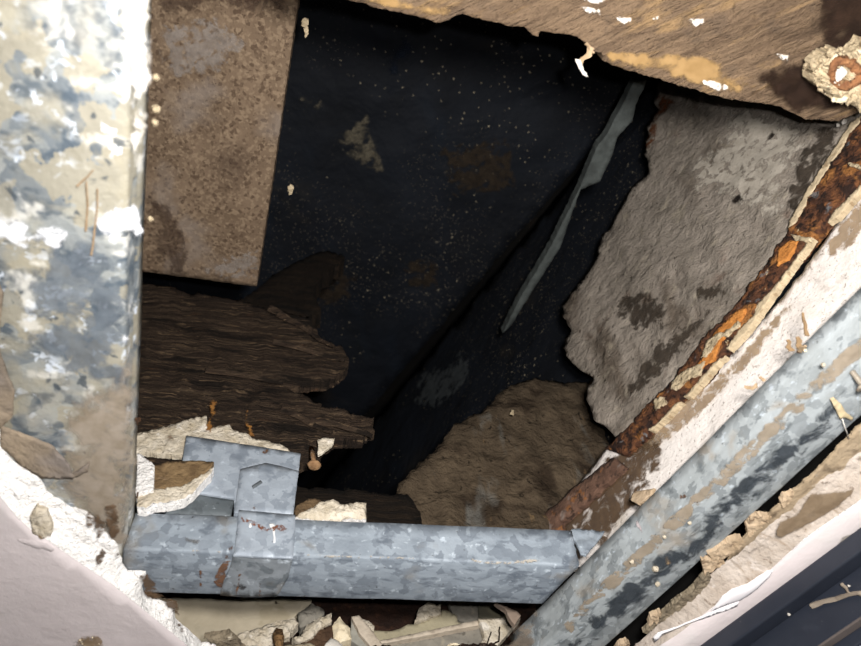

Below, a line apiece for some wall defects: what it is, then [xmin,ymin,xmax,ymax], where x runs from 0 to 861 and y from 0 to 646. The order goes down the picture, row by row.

peeling [607,52,741,91]
corrosion [827,55,861,91]
damp [697,283,725,299]
damp [617,292,665,330]
peeling [671,321,741,391]
peeling [653,396,667,410]
peeling [830,397,853,439]
flaking render [317,438,335,457]
damp [564,308,861,646]
flaking render [630,488,656,506]
spalling [0,445,190,646]
spalling [635,452,861,646]